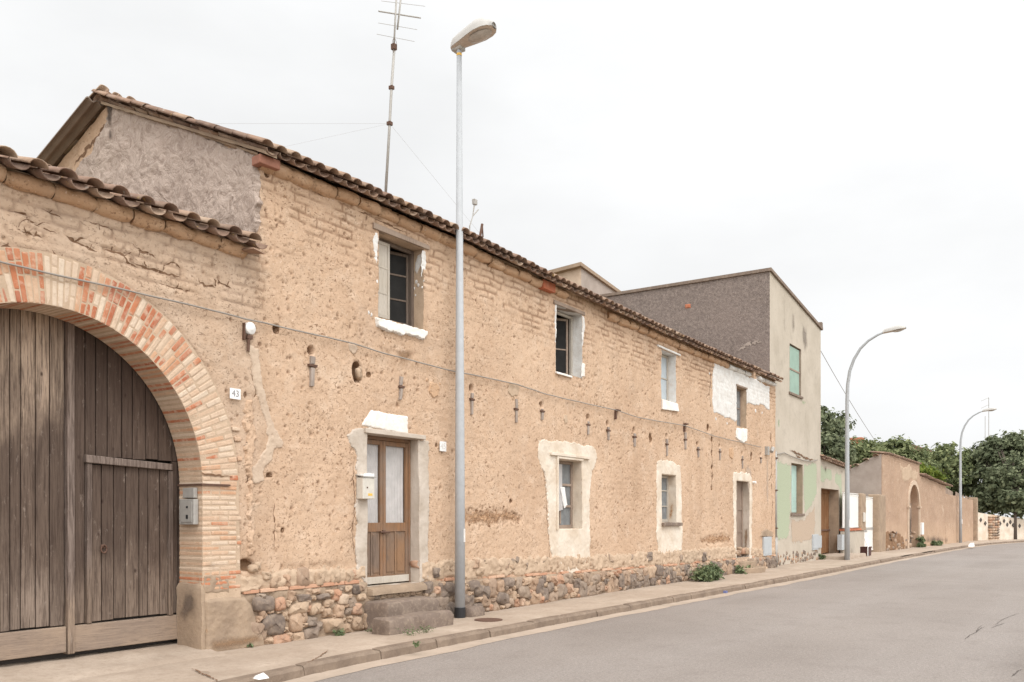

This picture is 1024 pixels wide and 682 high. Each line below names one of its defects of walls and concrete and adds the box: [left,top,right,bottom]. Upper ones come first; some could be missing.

crack [1,209,230,293]
peeling [707,363,770,431]
spalling [465,499,519,527]